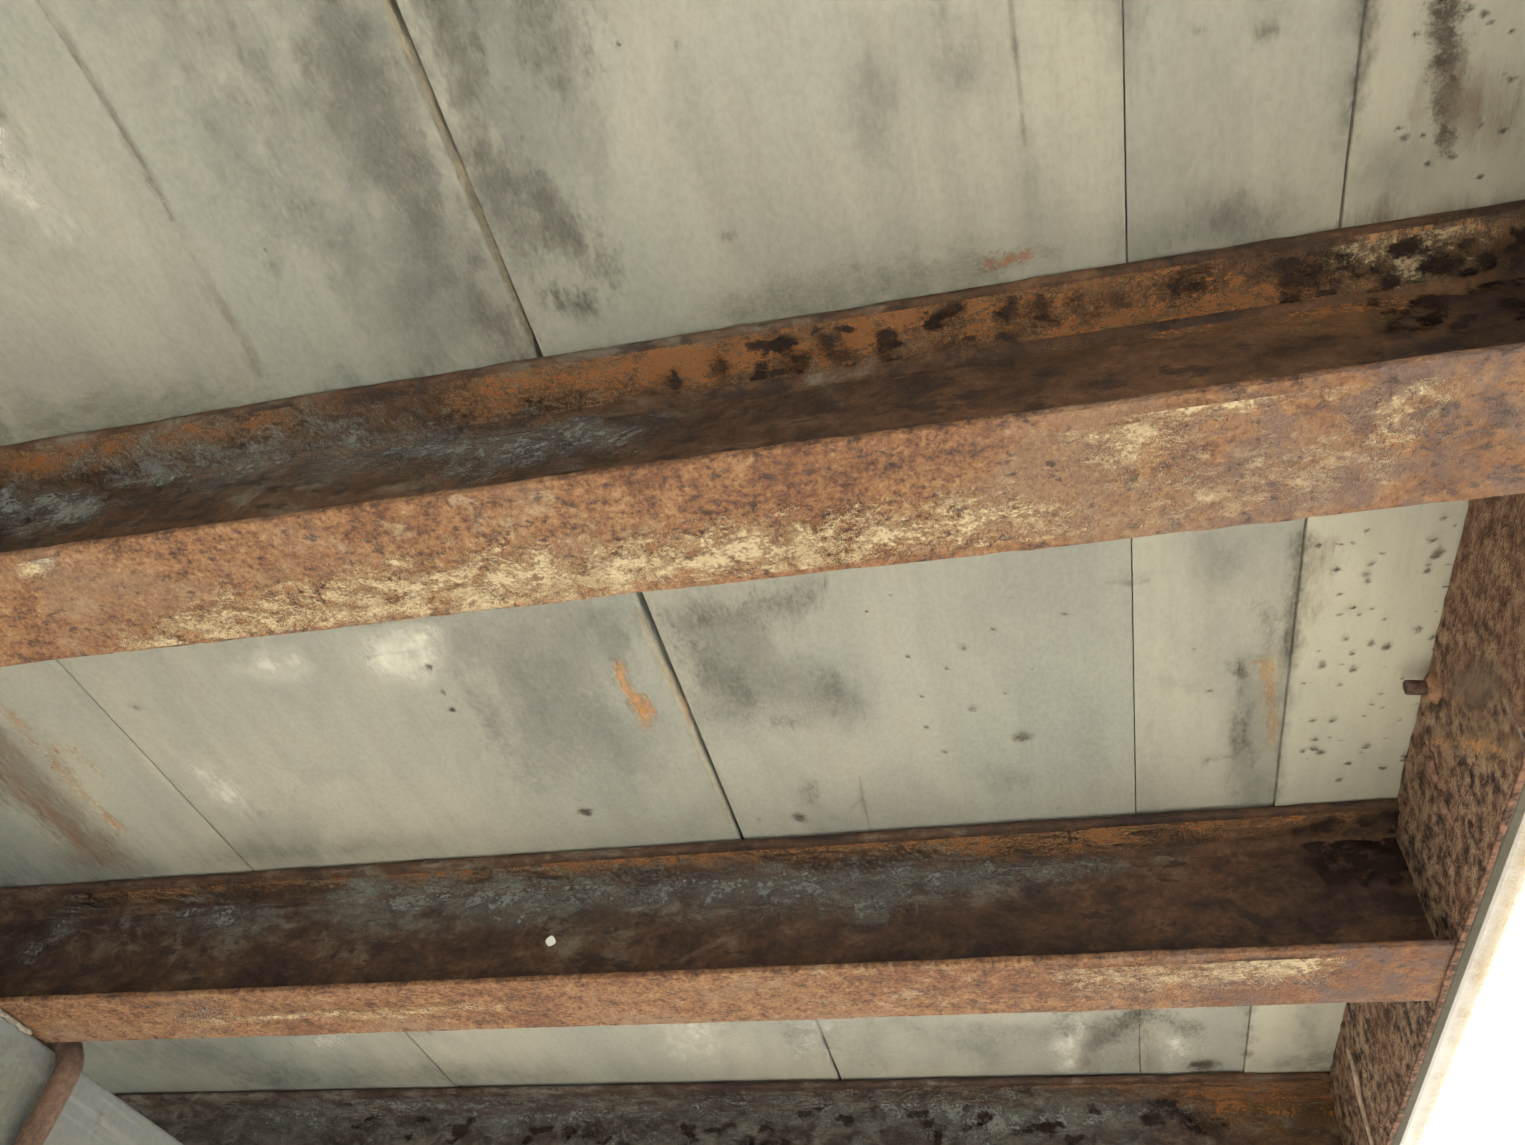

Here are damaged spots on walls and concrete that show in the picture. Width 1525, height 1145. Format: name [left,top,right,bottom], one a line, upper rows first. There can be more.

damp [1424,0,1480,153]
rust [446,218,1525,424]
rust [0,408,297,480]
rust [614,661,656,722]
rust [0,711,123,866]
rust [376,811,1408,888]
rust [521,1126,629,1145]
rust [680,1109,792,1145]
rust [798,1105,943,1145]
rust [957,1105,995,1132]
rust [991,1121,1085,1145]
rust [1346,1048,1375,1145]